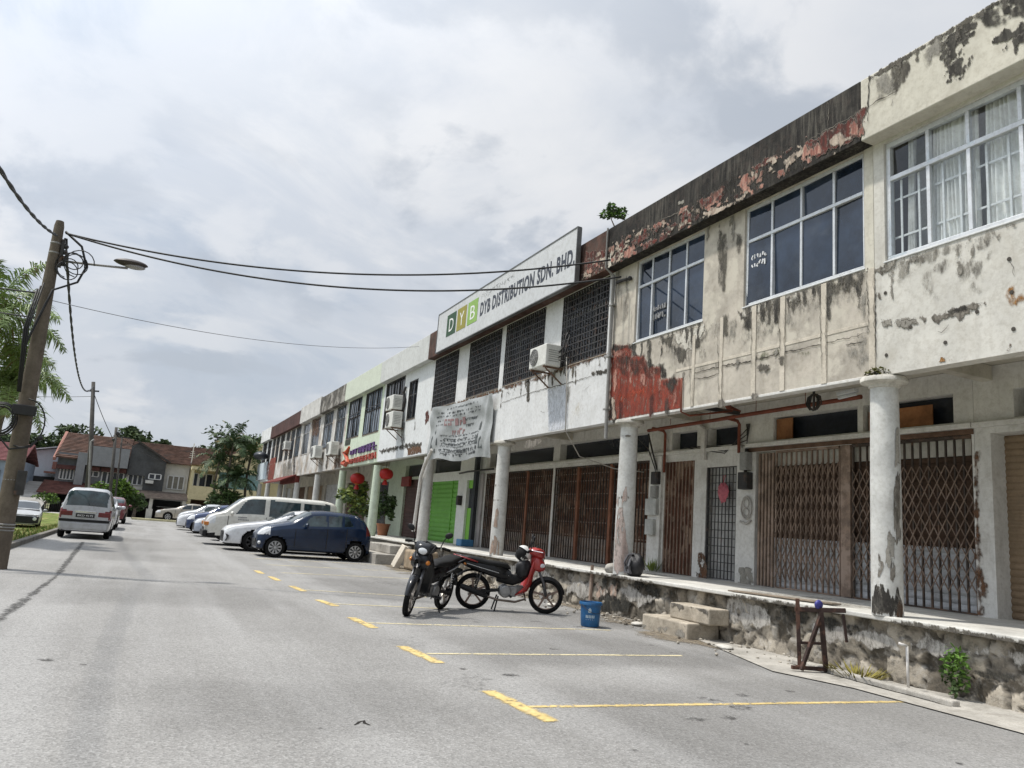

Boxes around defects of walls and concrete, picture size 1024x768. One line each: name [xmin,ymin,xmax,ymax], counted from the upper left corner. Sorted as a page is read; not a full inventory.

peeling [939,20,978,83]
peeling [992,21,1024,54]
peeling [581,107,867,280]
leakage [693,159,813,292]
leakage [888,223,1015,300]
leakage [631,271,868,379]
peeling [608,344,681,423]
peeling [566,486,658,608]
leakage [730,554,1024,645]
peeling [885,427,901,568]
corrosion [974,451,988,615]